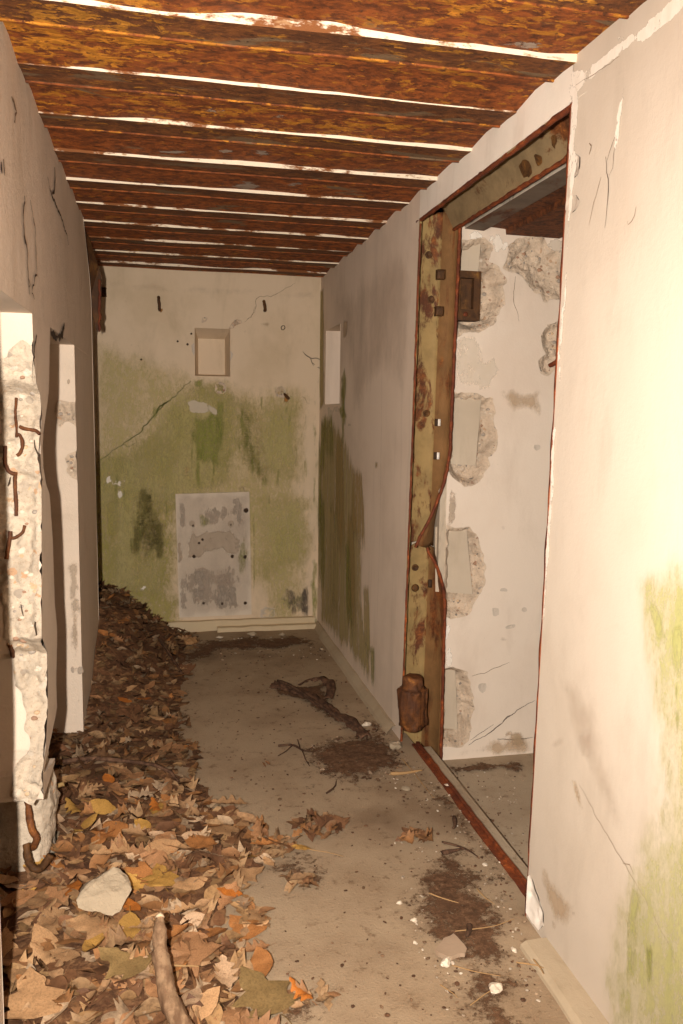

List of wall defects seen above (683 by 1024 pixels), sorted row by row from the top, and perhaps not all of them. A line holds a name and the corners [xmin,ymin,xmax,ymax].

crack [23,167,68,296]
spalling [449,0,683,487]
crack [589,137,636,225]
crack [100,381,191,460]
spalling [0,340,65,874]
peeling [178,507,239,608]
damp [318,390,374,682]
spalling [435,525,486,748]
crack [469,700,535,745]